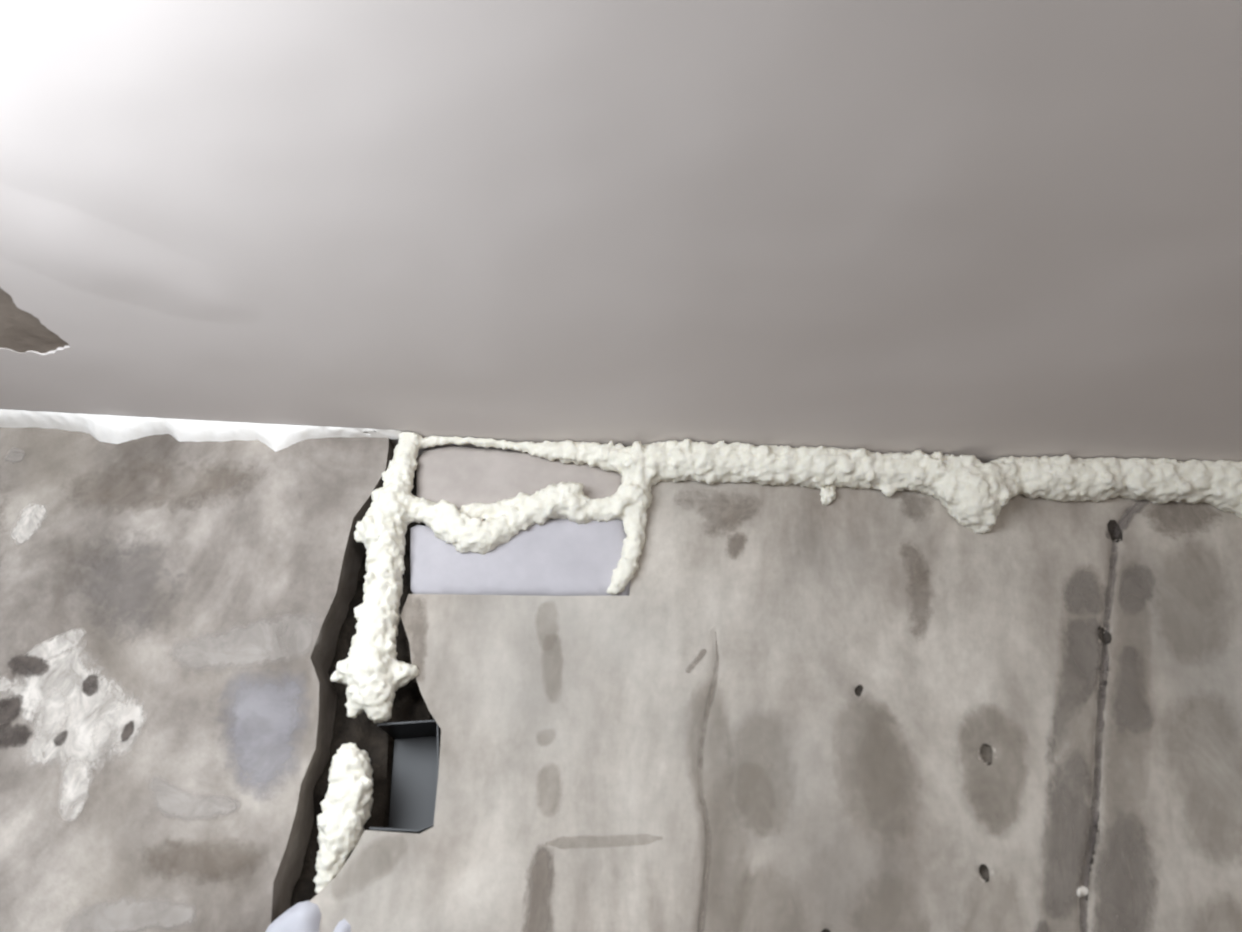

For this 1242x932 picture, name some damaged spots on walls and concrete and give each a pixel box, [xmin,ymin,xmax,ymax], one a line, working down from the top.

spalling [0,288,70,353]
crack [694,640,718,765]
crack [1037,499,1156,932]
leakage [523,847,552,932]
crack [698,800,710,932]